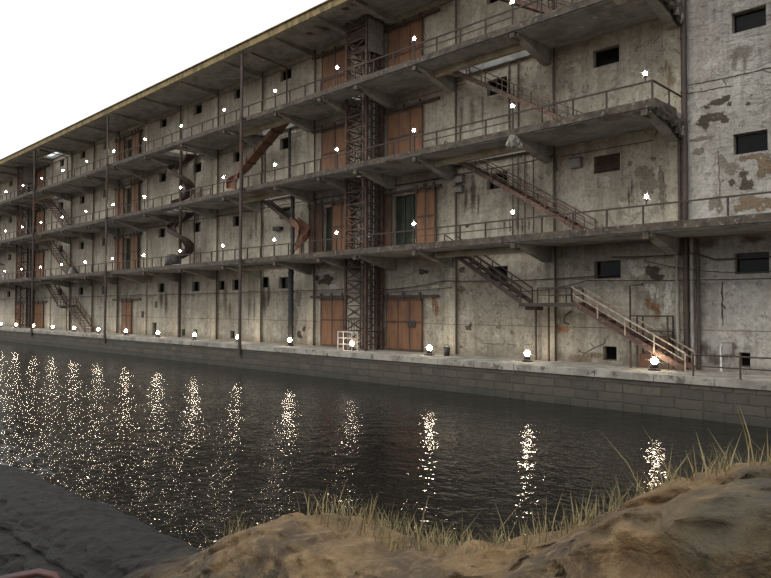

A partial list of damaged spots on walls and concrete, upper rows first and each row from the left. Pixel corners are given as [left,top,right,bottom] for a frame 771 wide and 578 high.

spalling [656,94,732,155]
peeling [627,157,667,210]
peeling [708,152,771,213]